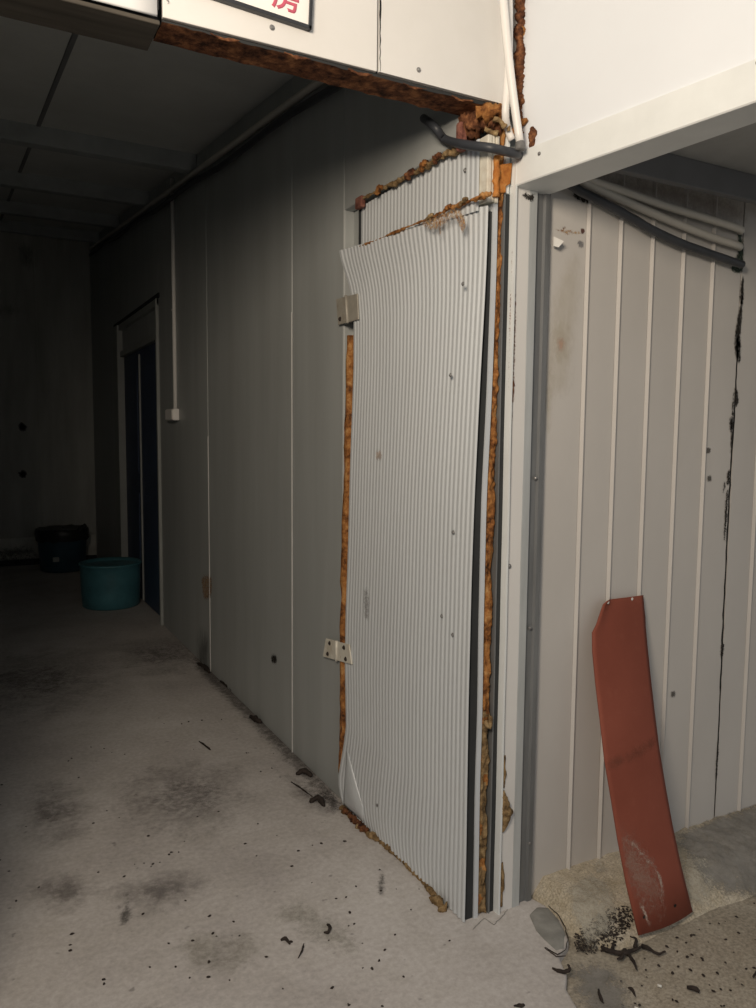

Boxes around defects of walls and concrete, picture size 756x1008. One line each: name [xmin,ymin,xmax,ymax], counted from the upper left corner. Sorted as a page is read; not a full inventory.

corrosion [153,22,484,116]